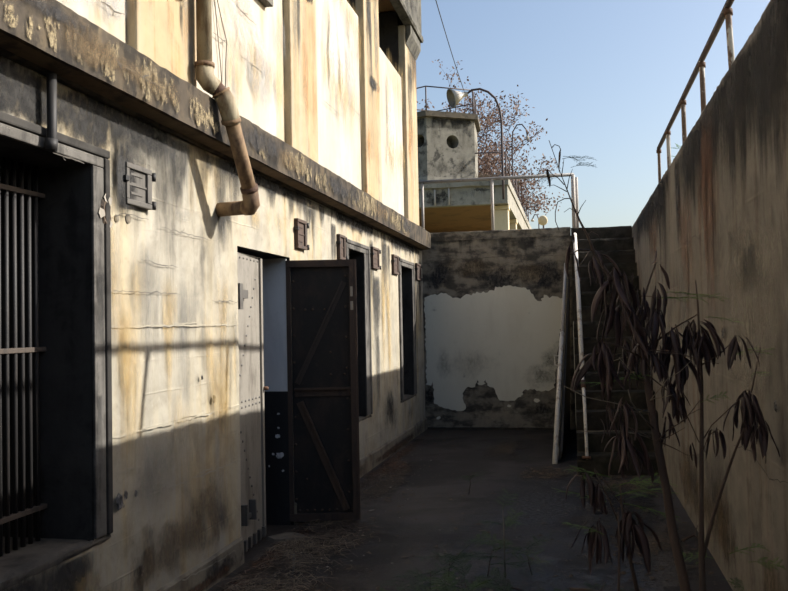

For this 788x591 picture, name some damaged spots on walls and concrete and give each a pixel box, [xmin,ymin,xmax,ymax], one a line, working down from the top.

peeling [4,5,18,27]
damp [0,61,47,126]
peeling [27,16,126,81]
damp [57,91,190,209]
peeling [136,59,179,111]
peeling [190,97,222,134]
damp [206,154,239,202]
damp [408,49,416,89]
damp [635,0,788,246]
spalling [99,194,113,228]
damp [253,173,419,328]
peeling [424,285,562,419]